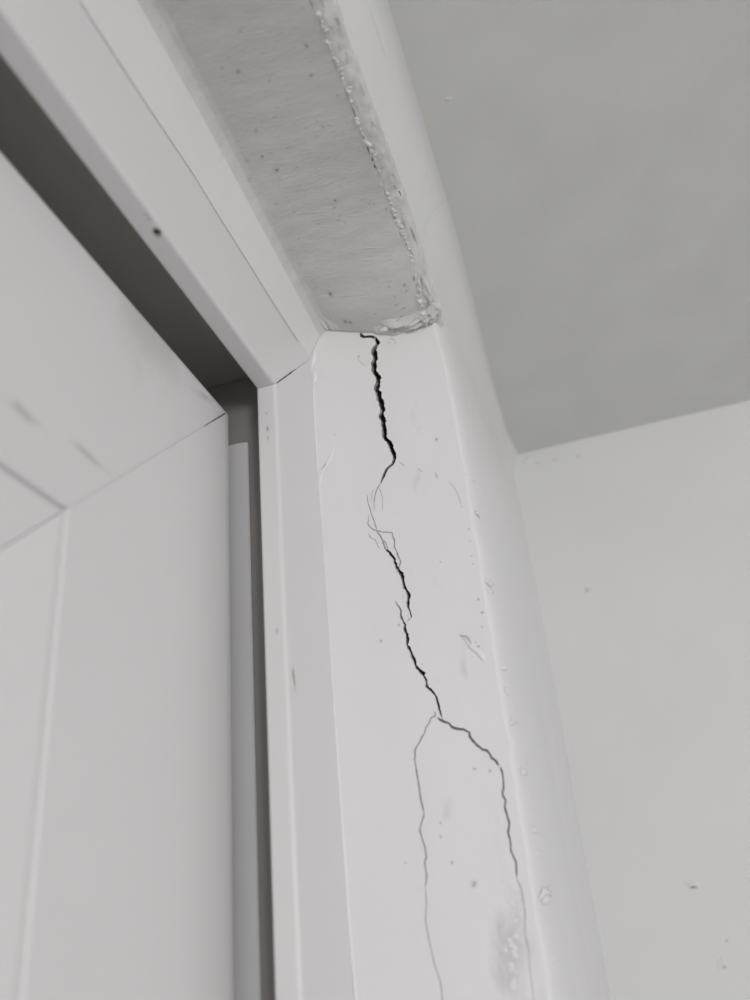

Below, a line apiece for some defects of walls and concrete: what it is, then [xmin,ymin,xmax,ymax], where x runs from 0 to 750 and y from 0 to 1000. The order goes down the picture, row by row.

crack [360,333,534,1000]